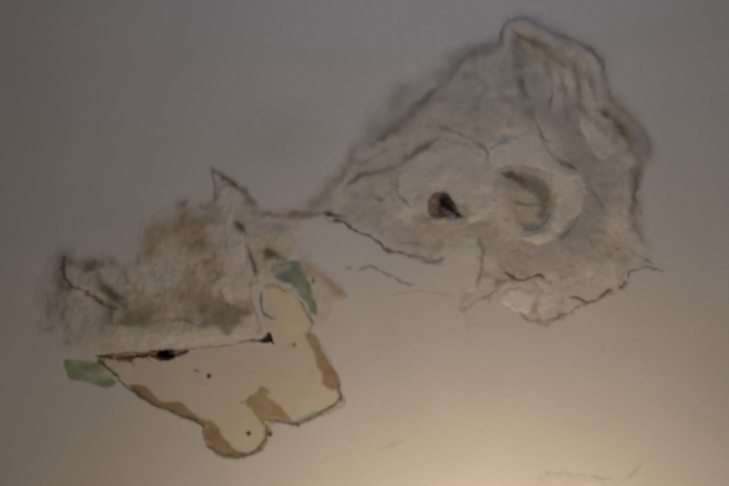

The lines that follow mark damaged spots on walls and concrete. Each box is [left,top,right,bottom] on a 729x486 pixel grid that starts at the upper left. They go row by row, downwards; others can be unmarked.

flaking render [327,22,662,328]
damp [137,213,175,265]
crack [323,208,445,267]
damp [34,254,76,338]
crack [45,242,137,316]
damp [115,279,256,338]
flaking render [52,164,342,459]
crack [461,272,544,334]